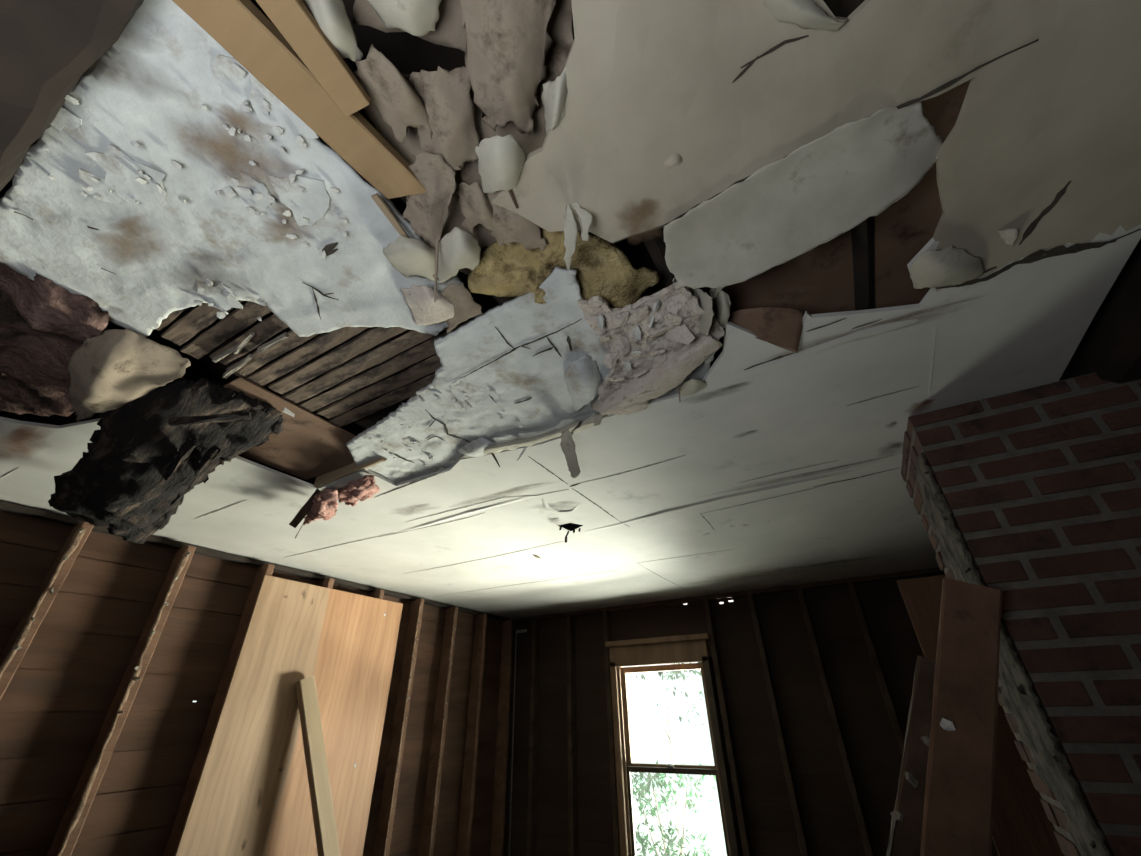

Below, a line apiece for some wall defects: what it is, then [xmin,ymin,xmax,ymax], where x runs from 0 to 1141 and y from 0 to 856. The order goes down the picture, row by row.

peeling [302,0,363,62]
peeling [367,0,441,36]
peeling [541,68,568,134]
flaking render [212,54,339,259]
peeling [475,134,527,194]
flaking render [193,279,266,321]
peeling [383,227,483,333]
flaking render [401,278,731,479]
crack [847,386,919,406]
crack [374,409,479,498]
crack [288,455,685,557]
crack [639,460,897,586]